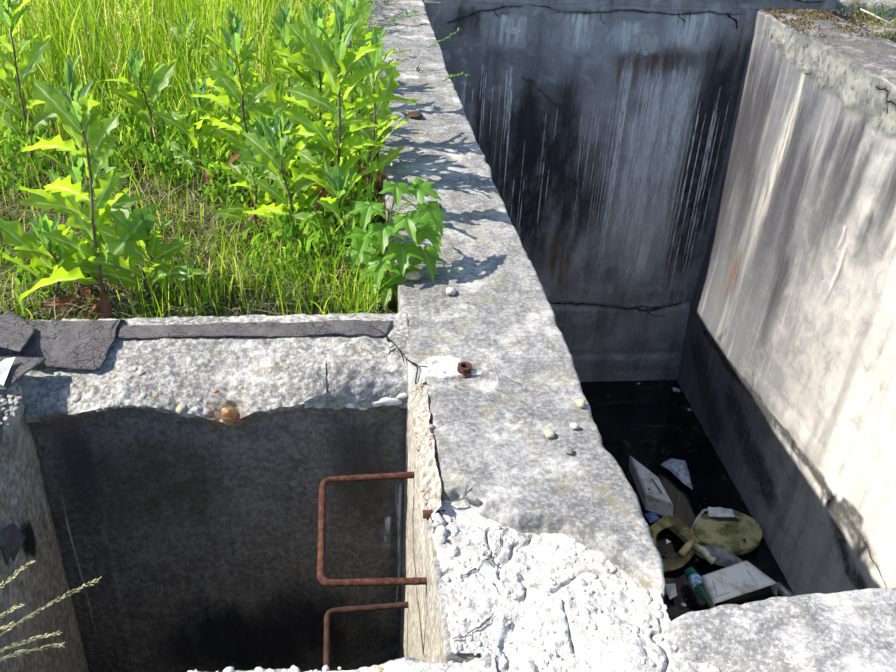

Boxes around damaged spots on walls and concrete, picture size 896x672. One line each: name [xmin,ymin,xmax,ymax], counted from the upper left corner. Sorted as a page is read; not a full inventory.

crack [448,4,738,29]
crack [875,86,896,113]
water stain [454,12,775,278]
water stain [758,74,807,239]
water stain [822,114,866,212]
water stain [864,167,896,250]
crack [551,300,688,317]
water stain [767,255,788,312]
spalling [0,393,23,426]
water stain [692,316,865,590]
spalling [36,357,720,672]
water stain [198,599,345,664]